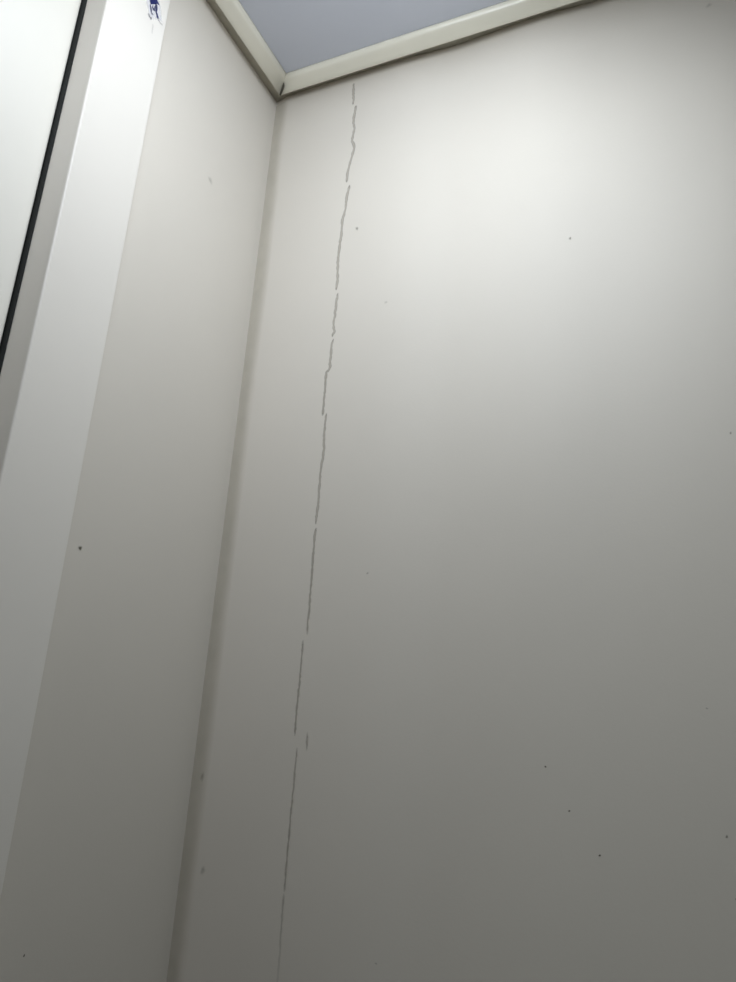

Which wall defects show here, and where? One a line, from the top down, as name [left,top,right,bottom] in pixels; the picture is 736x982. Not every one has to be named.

crack [307,85,357,631]
crack [294,657,302,732]